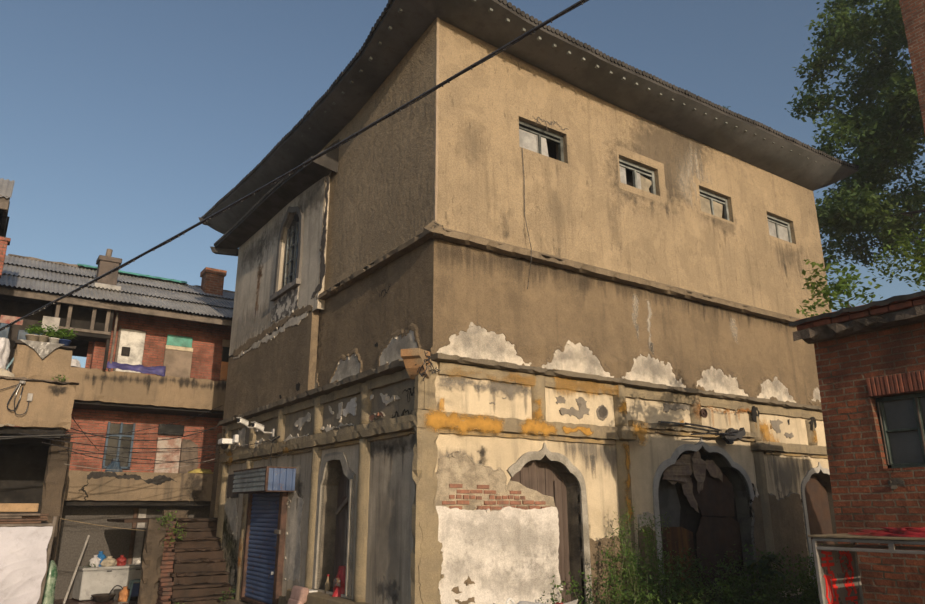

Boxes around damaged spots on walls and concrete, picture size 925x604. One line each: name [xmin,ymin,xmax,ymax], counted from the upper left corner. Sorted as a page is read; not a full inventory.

spalling [311,175,330,299]
flaking render [233,298,309,359]
flaking render [315,348,363,388]
flaking render [375,320,821,423]
spalling [770,419,794,439]